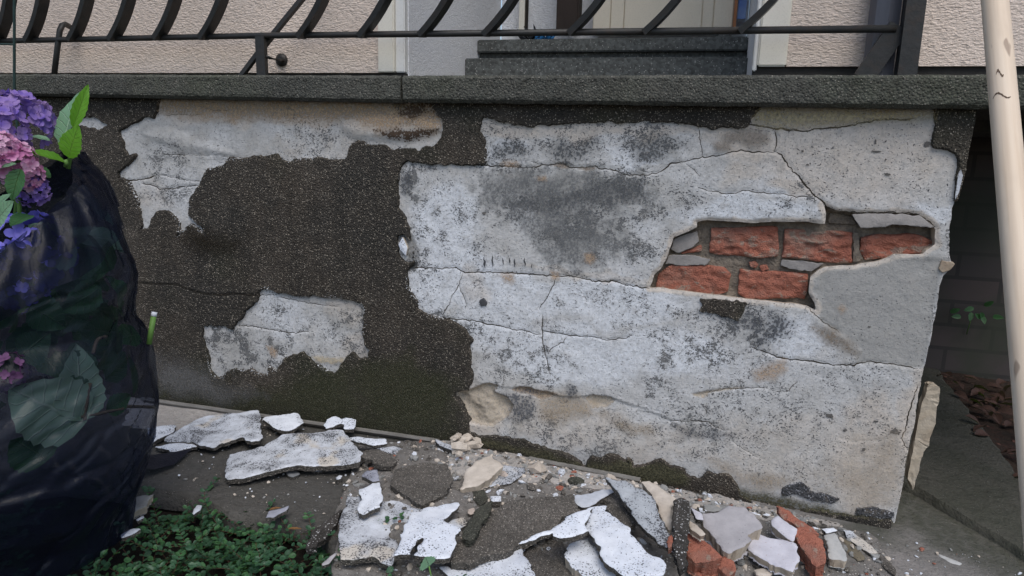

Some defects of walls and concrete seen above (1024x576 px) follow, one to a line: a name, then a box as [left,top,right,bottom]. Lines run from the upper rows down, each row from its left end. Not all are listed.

flaking render [79,117,107,130]
flaking render [120,99,437,236]
crack [453,118,935,227]
flaking render [203,289,370,377]
crack [415,267,647,378]
flaking render [370,107,957,576]
leakage [499,380,588,424]
leakage [670,424,735,443]
crack [672,347,918,457]